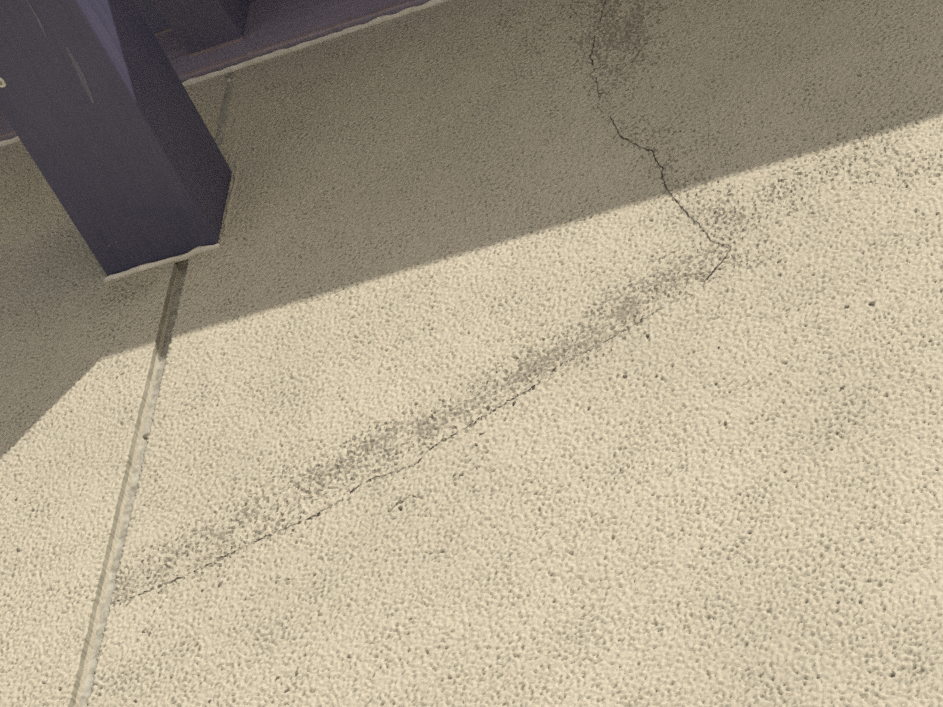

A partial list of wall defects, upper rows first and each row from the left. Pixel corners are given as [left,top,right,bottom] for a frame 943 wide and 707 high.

crack [112,0,735,603]
water stain [104,0,943,613]